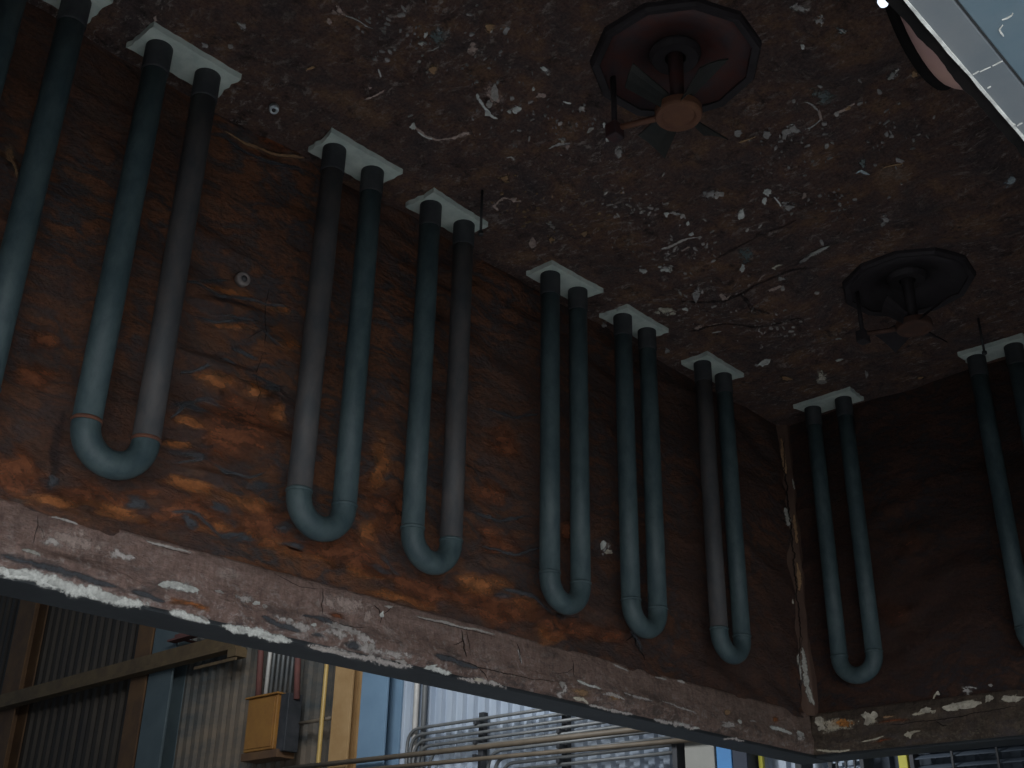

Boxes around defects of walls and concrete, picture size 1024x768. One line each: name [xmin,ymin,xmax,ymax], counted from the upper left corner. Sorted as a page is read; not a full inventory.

rust [1,448,35,480]
rust [166,475,212,494]
rust [22,495,148,522]
crack [783,439,803,690]
peeling [0,567,143,607]
peeling [158,581,199,593]
rust [457,573,566,644]
peeling [170,590,411,668]
peeling [797,647,825,731]
peeling [912,684,1024,716]
peeling [861,711,878,725]